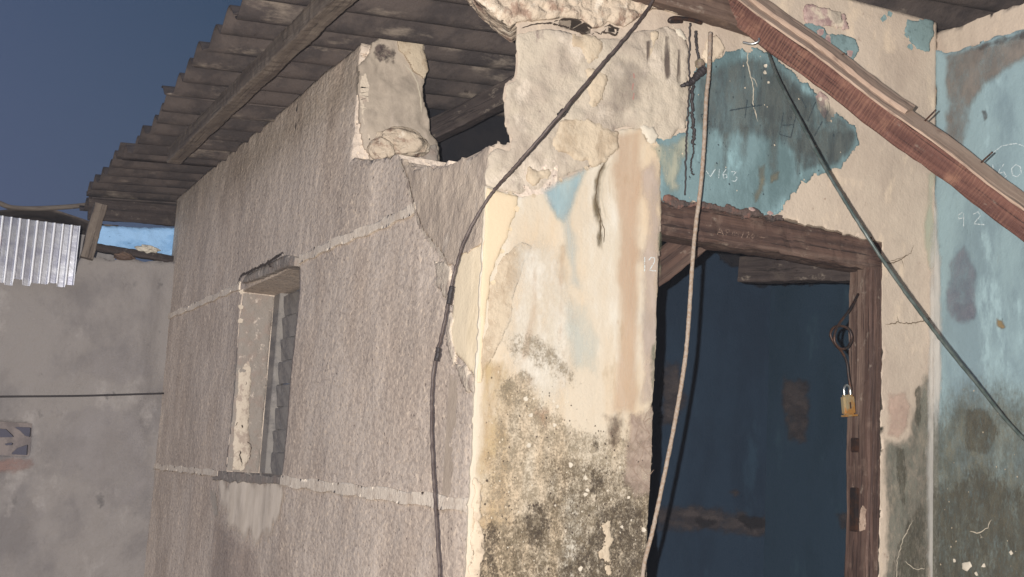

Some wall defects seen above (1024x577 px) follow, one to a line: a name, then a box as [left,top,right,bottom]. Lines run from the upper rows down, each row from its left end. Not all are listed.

peeling [803,4,859,61]
water stain [946,37,1024,142]
flaking render [398,25,784,419]
peeling [211,358,283,546]
water stain [514,337,571,381]
water stain [473,365,649,577]
peeling [597,519,646,576]
water stain [886,173,1024,577]